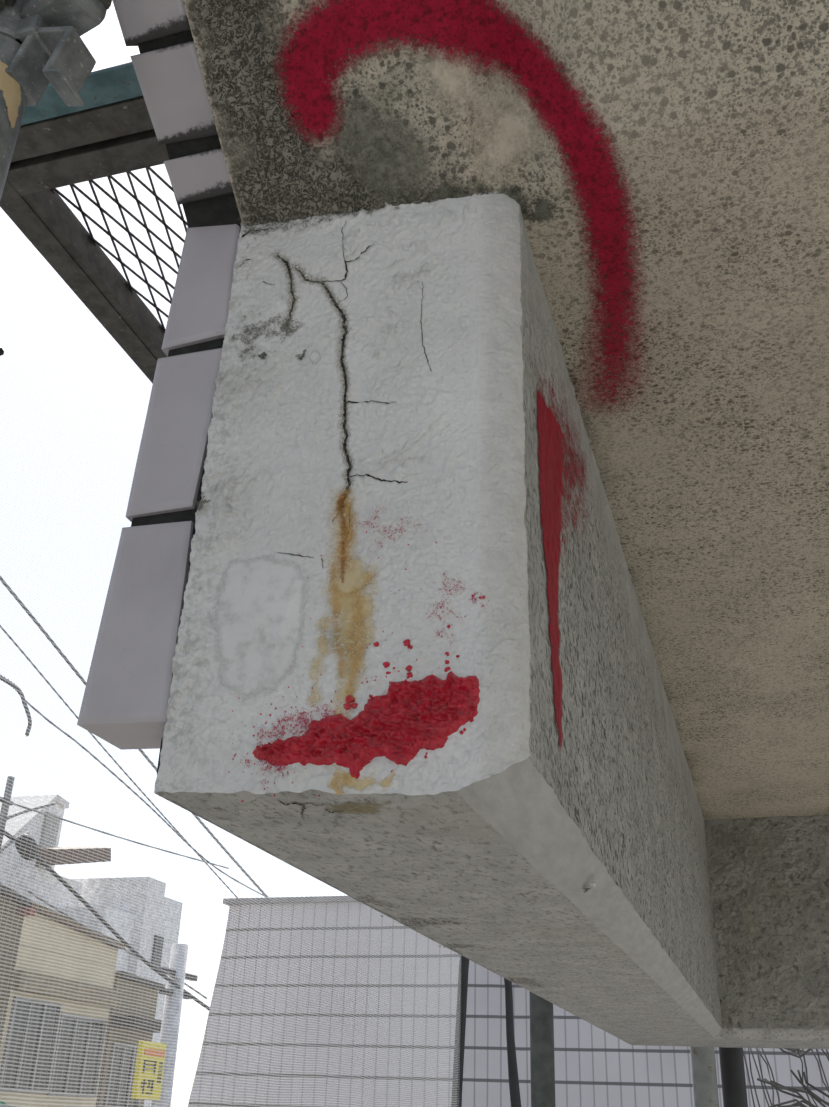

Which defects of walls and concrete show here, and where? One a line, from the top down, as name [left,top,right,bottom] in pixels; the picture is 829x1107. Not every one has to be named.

water stain [191,0,556,235]
crack [239,223,406,580]
crack [420,282,432,372]
corrosion [314,498,374,712]
corrosion [329,770,394,814]